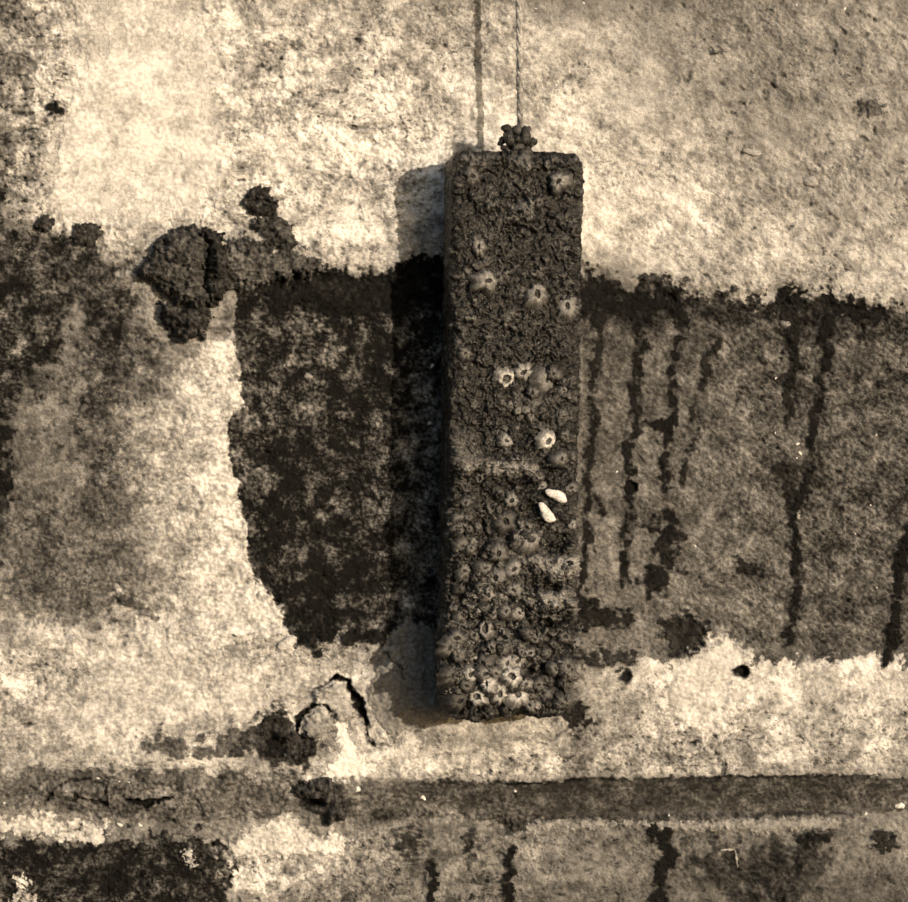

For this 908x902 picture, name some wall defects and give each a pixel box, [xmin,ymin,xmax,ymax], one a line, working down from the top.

leakage [227,249,444,646]
leakage [574,262,908,675]
crack [295,674,376,747]
leakage [425,858,440,902]
leakage [499,845,518,902]
leakage [647,822,837,902]
leakage [870,828,905,855]